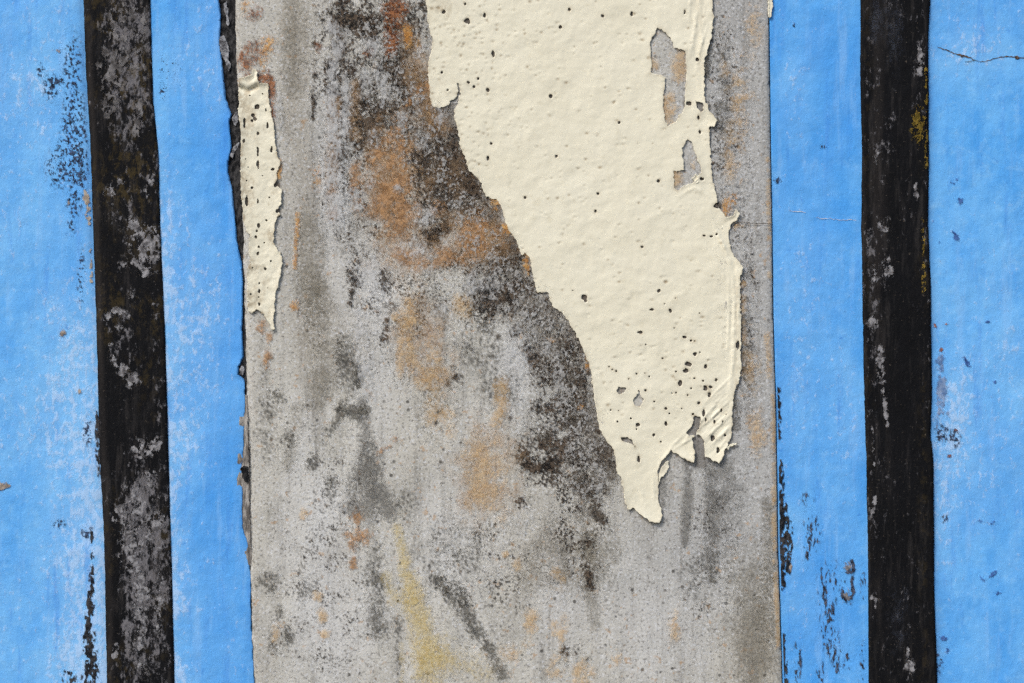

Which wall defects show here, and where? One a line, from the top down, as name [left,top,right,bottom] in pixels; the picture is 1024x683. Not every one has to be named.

crack [938,47,1024,62]
peeling [219,2,283,330]
rust [351,81,510,269]
damp [286,0,616,607]
peeling [426,0,743,523]
damp [258,389,294,459]
rust [345,513,370,569]
damp [430,523,528,679]
peeling [783,633,802,683]
peeling [779,459,820,591]
peeling [817,559,877,683]
peeling [903,647,915,672]